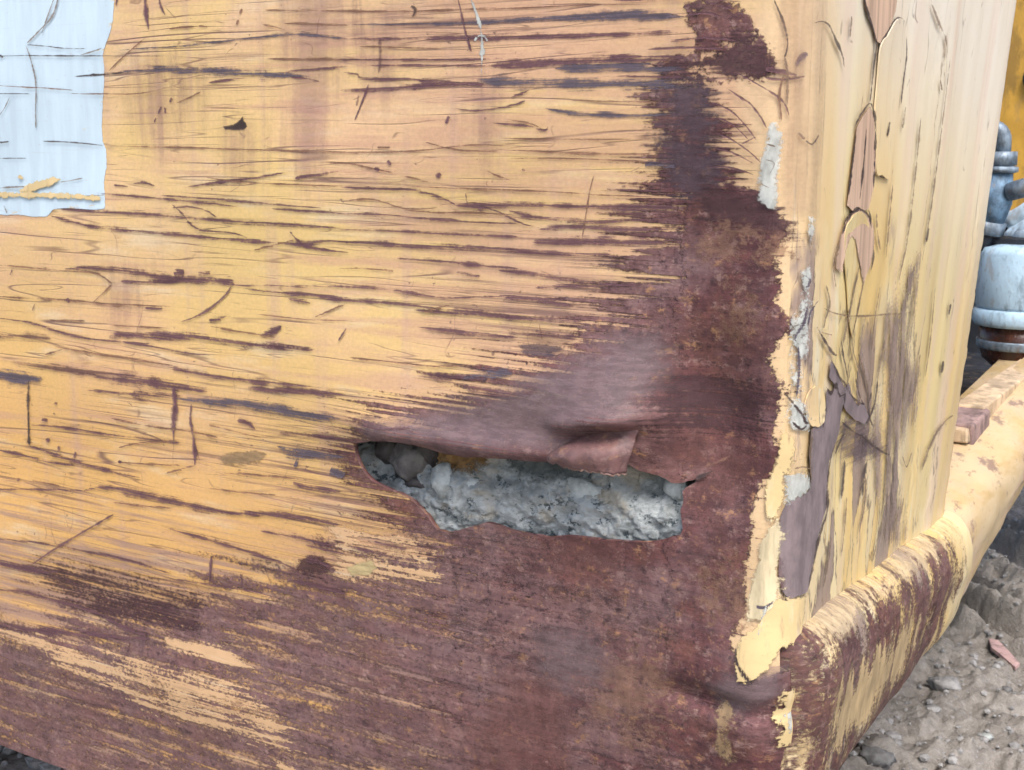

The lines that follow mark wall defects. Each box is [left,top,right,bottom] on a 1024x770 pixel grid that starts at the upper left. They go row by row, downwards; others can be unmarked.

corrosion [652,0,777,87]
corrosion [627,84,722,134]
corrosion [644,113,751,145]
peeling [0,175,101,213]
peeling [734,0,921,684]
corrosion [0,142,964,770]
spalling [357,441,697,541]